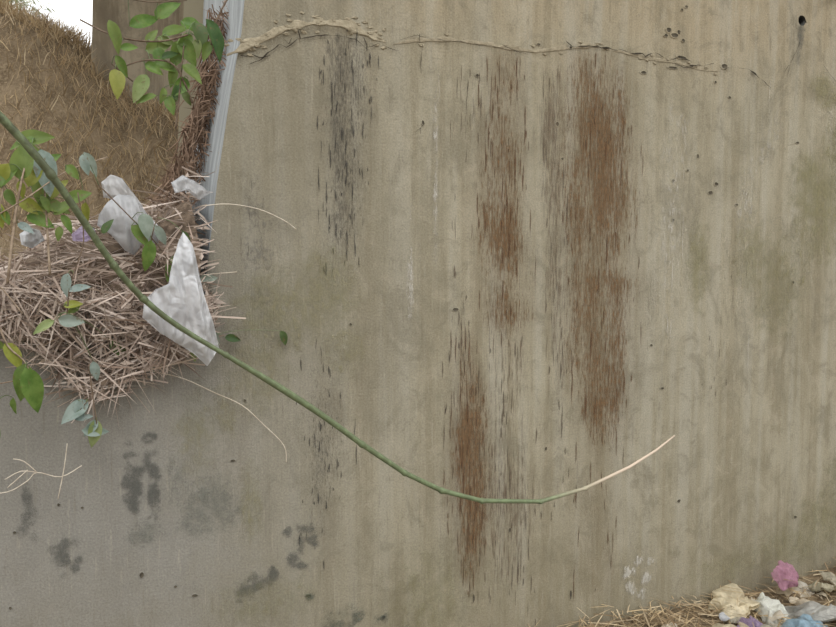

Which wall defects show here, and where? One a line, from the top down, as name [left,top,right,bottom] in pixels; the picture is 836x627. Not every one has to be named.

damp [317,30,379,264]
crack [239,31,526,67]
corrosion [471,55,533,346]
corrosion [557,54,640,455]
crack [566,41,766,83]
damp [123,459,159,512]
corrosion [443,328,493,595]